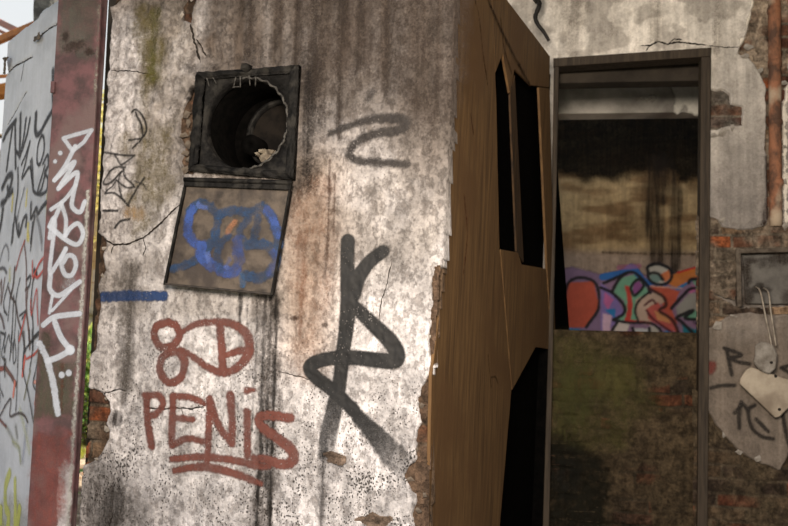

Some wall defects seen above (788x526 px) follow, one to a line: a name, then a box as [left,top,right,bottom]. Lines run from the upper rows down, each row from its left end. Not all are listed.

crack [190,24,206,60]
crack [641,38,740,51]
flaking render [709,0,788,330]
crack [106,204,180,255]
water stain [602,155,695,274]
flaking render [429,265,441,355]
peeling [57,461,73,526]
flaking render [85,389,111,464]
water stain [251,295,280,526]
flaking render [354,512,393,526]
flaking render [405,378,432,526]
flaking render [708,412,788,526]